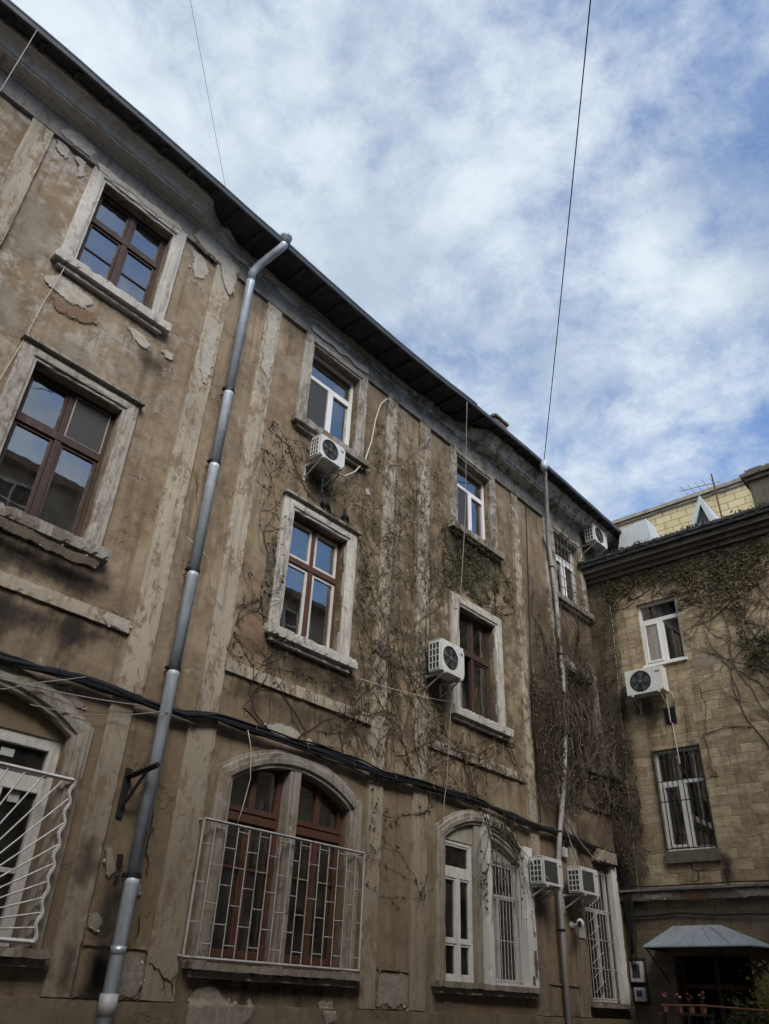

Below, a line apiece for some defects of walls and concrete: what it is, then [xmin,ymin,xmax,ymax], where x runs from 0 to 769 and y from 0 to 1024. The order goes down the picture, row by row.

flaking render [56,128,240,295]
flaking render [42,273,94,309]
flaking render [128,326,174,360]
crack [73,963,177,1001]
flaking render [185,983,255,1024]